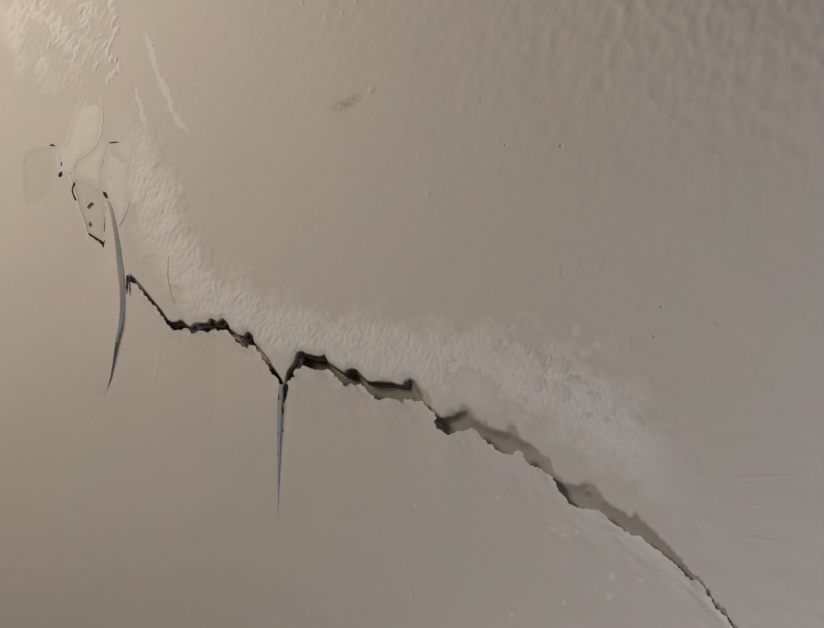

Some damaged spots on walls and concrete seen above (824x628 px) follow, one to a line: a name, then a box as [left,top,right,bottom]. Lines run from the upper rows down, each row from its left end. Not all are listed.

peeling [50,94,733,628]
crack [126,255,738,628]